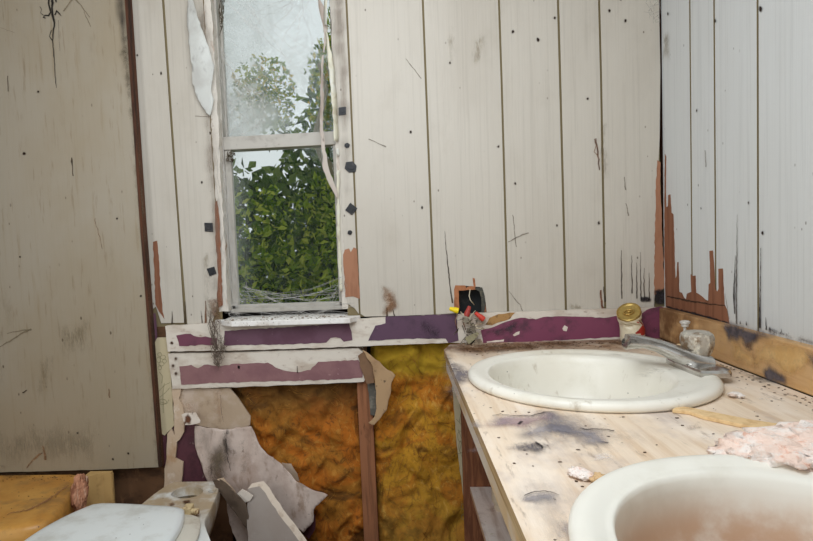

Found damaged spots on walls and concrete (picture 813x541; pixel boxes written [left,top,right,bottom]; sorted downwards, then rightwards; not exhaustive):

peeling [176,323,352,346]
peeling [368,314,459,343]
peeling [481,306,620,343]
peeling [641,290,665,339]
peeling [179,360,363,385]
damp [756,368,785,383]